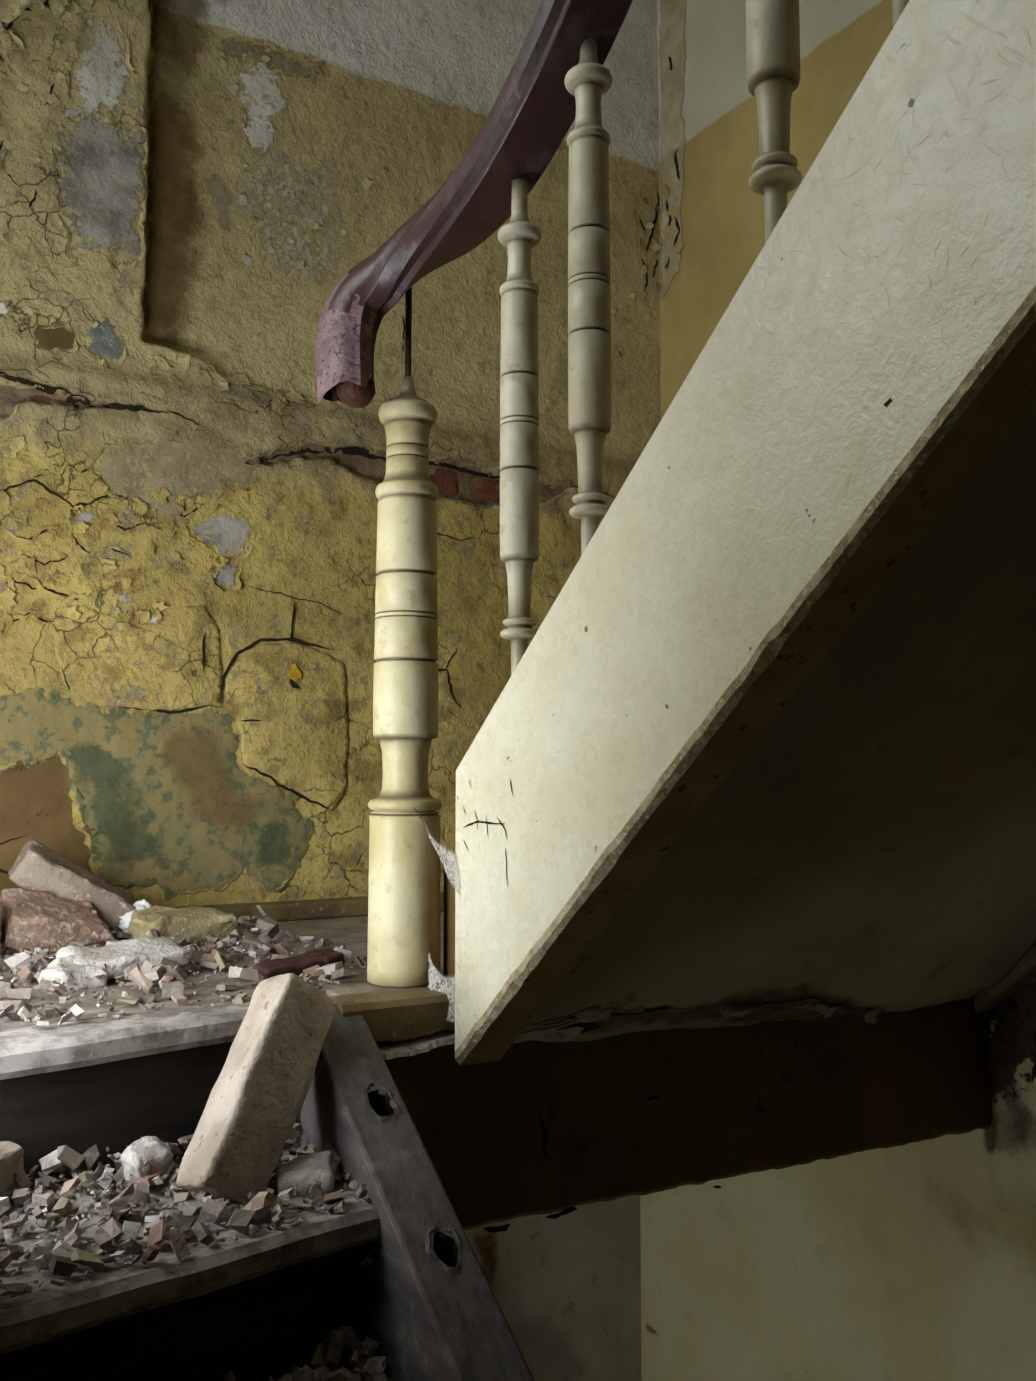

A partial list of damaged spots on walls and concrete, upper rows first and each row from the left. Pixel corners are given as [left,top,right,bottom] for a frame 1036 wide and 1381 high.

peeling [0,0,149,272]
peeling [0,301,127,371]
flaking render [0,369,169,491]
crack [167,394,258,427]
peeling [68,424,387,592]
flaking render [429,451,500,507]
peeling [108,578,168,627]
crack [246,585,346,617]
crack [438,647,464,709]
leakage [69,746,168,869]
leakage [260,824,290,865]
flaking render [985,974,1036,1104]